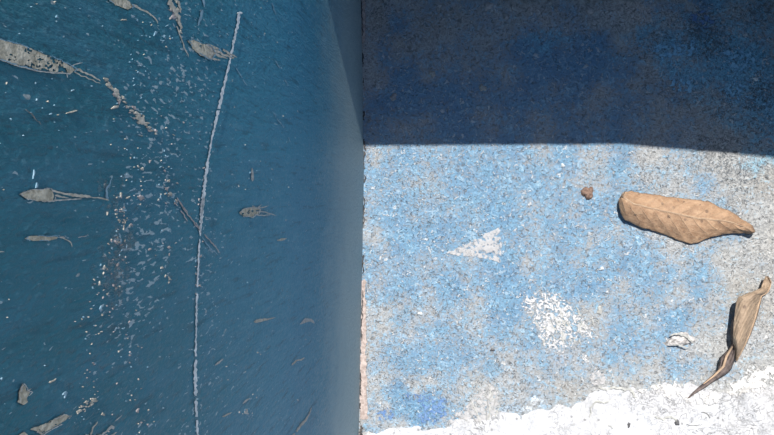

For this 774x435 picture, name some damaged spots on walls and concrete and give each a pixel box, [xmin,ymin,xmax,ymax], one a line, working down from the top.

peeling [0,33,179,207]
peeling [108,0,247,85]
peeling [18,138,151,435]
peeling [239,205,277,224]